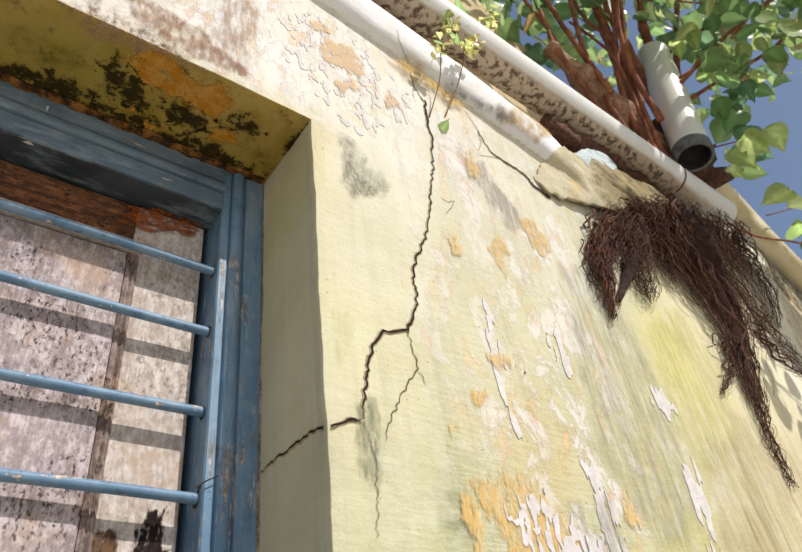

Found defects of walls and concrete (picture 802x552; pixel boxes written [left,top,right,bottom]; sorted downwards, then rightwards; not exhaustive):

leakage [0,0,273,179]
peeling [277,9,414,136]
leakage [282,124,308,155]
crack [466,112,551,199]
crack [255,29,455,552]
peeling [482,298,523,439]
peeling [546,325,573,379]
peeling [649,385,678,422]
leakage [91,529,118,552]
leakage [134,507,170,552]
peeling [460,459,642,552]
peeling [681,457,721,552]